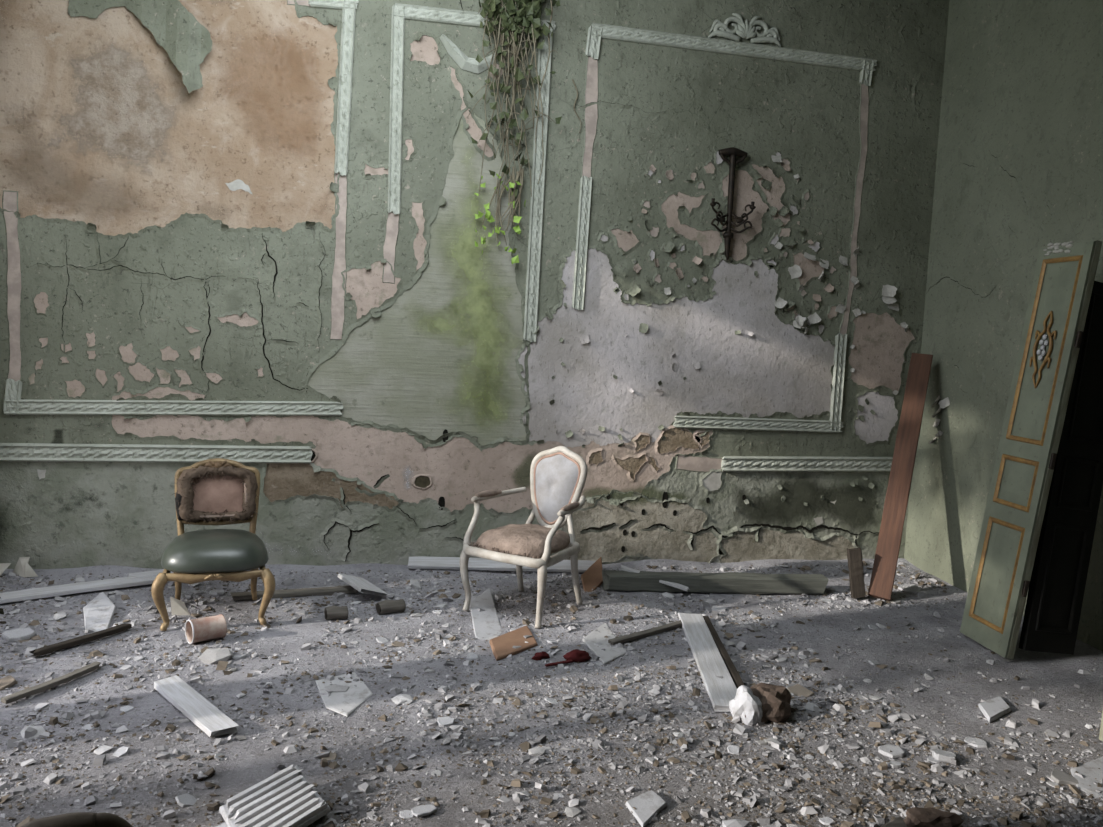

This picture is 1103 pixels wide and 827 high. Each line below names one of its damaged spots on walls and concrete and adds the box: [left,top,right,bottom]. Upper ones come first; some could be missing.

flaking render [0,0,341,240]
peeling [32,290,51,317]
crack [33,230,325,401]
flaking render [108,31,917,564]
peeling [27,324,226,401]
crack [320,474,464,562]
crack [580,519,879,550]